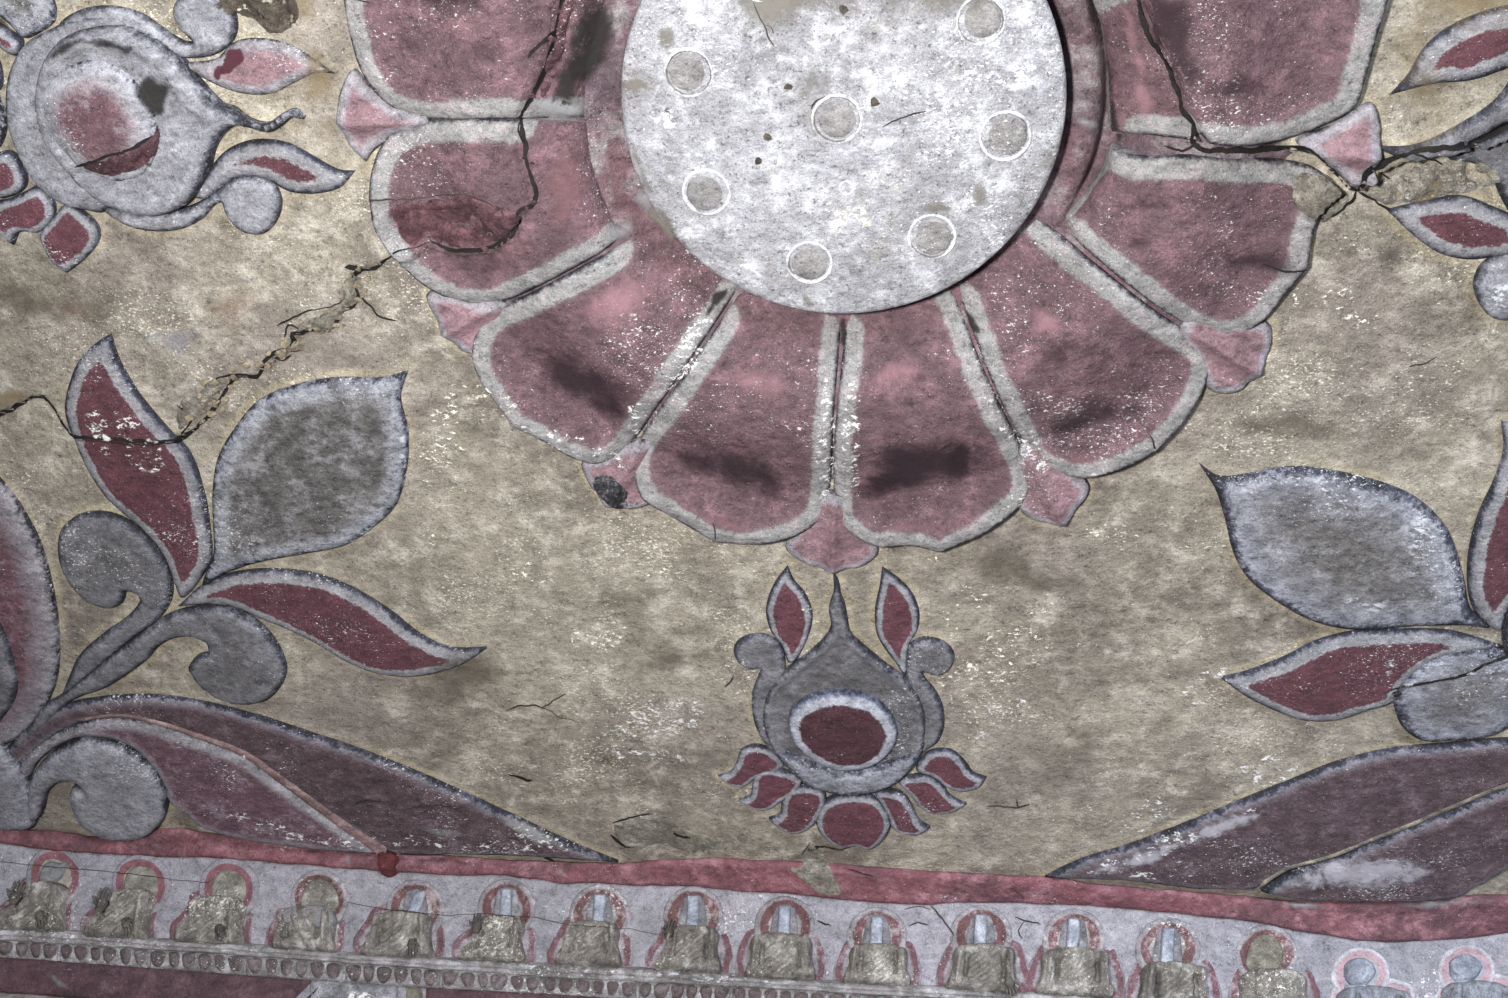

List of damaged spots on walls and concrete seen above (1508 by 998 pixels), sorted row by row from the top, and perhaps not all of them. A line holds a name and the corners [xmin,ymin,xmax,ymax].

spalling [216,0,299,33]
crack [1136,0,1508,219]
crack [0,0,572,444]
spalling [391,197,522,251]
crack [1388,638,1508,697]